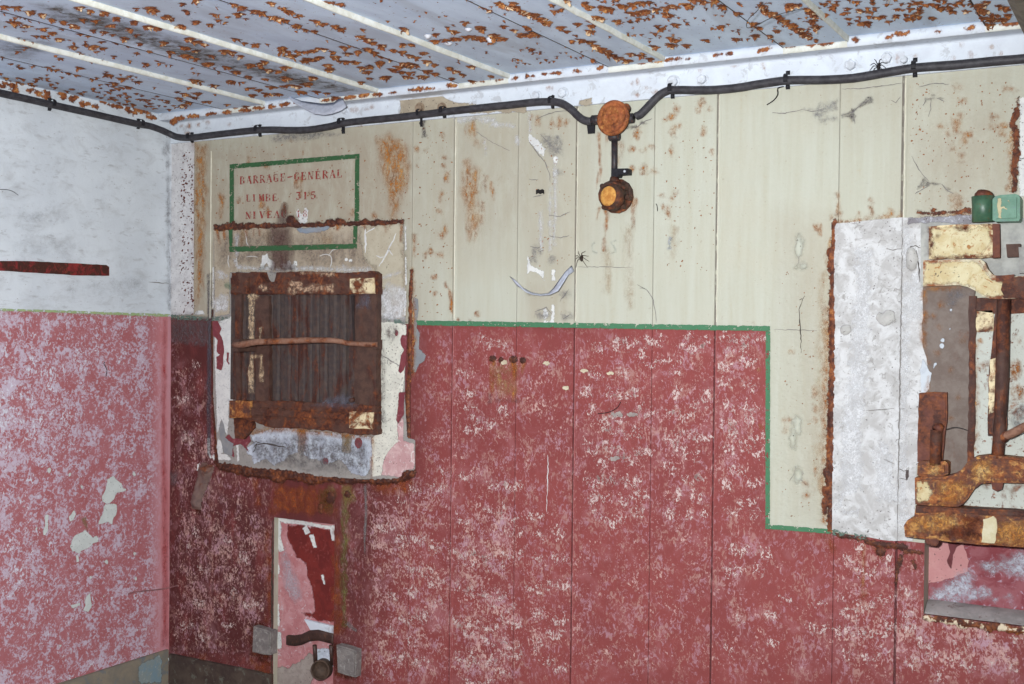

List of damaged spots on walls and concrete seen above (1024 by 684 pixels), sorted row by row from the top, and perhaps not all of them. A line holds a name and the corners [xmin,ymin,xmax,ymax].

rust [0,0,1019,128]
rust [195,147,234,296]
rust [320,126,459,364]
rust [464,168,494,229]
peeling [196,208,426,477]
rust [489,355,526,396]
peeling [896,272,920,526]
peeling [70,476,126,562]
peeling [278,518,335,552]
rust [912,516,980,539]